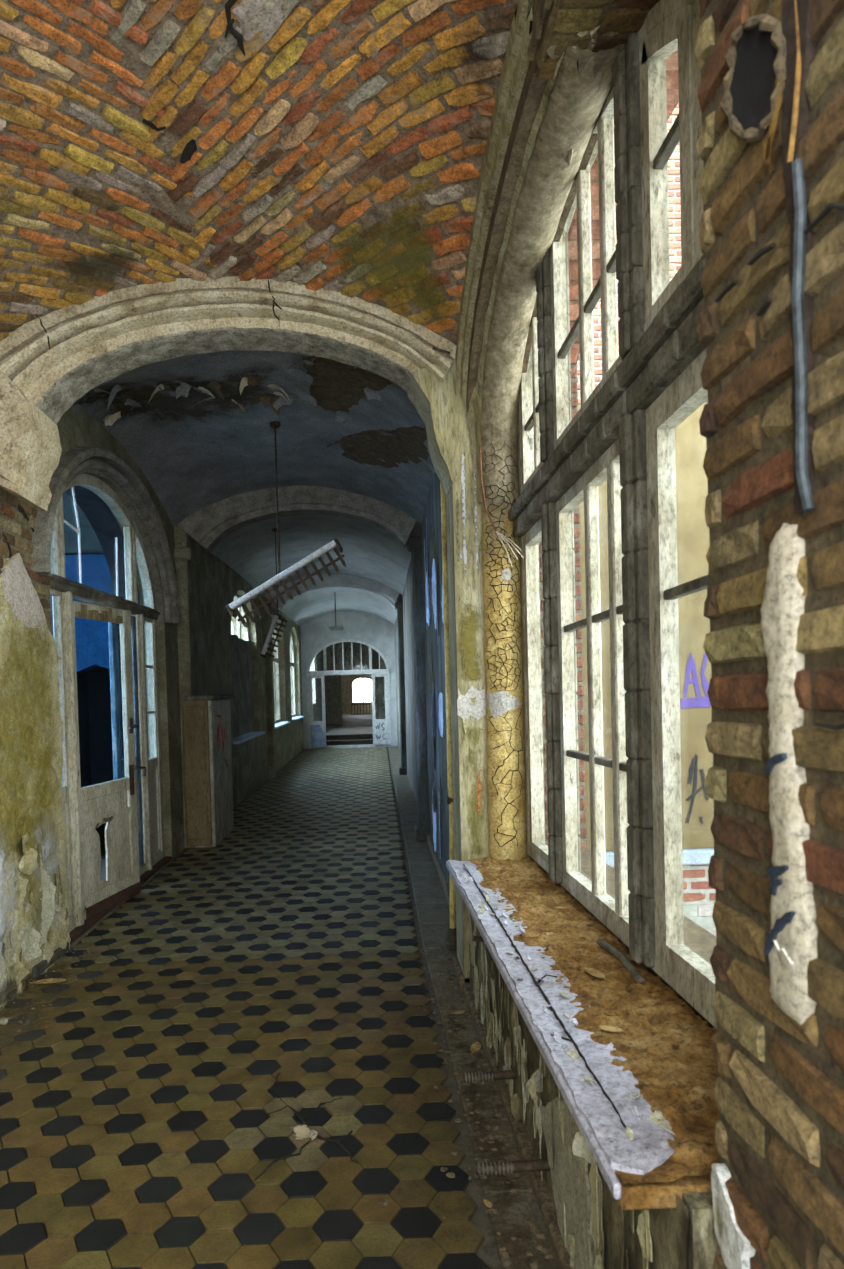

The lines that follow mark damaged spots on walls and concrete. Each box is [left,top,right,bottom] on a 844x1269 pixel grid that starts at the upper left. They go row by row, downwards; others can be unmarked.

flaking render [232,0,284,43]
spalling [720,14,787,143]
flaking render [71,355,435,474]
flaking render [1,553,46,628]
crack [483,441,523,847]
leakage [0,632,57,953]
peeling [2,833,70,987]
crack [463,864,627,1129]
crack [255,1073,359,1181]
peeling [459,865,653,1269]
peeling [608,1094,674,1142]